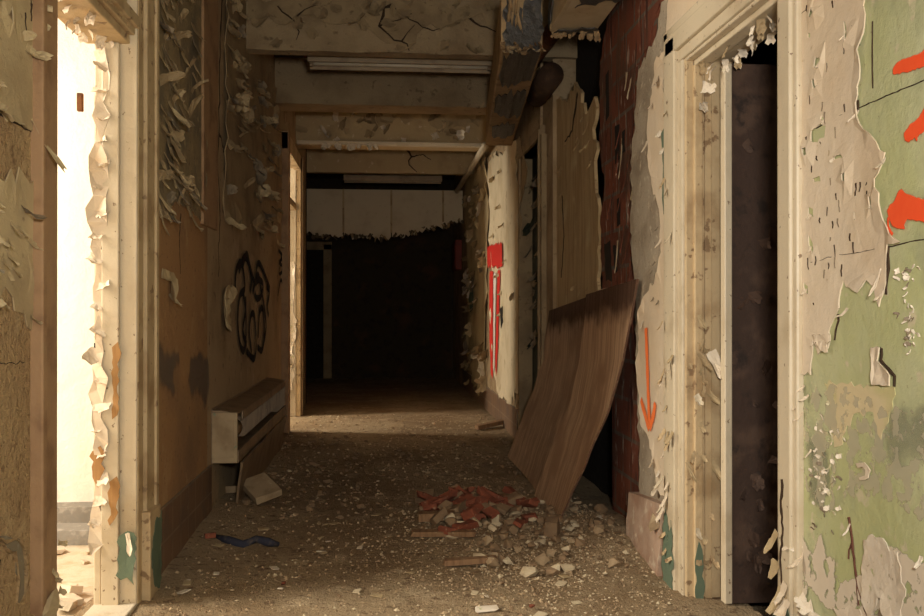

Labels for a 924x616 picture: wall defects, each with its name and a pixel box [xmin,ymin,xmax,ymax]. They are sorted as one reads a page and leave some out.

peeling [0,0,54,133]
peeling [159,0,209,236]
crack [277,5,317,40]
crack [378,4,440,51]
crack [815,21,924,129]
peeling [0,167,47,331]
peeling [45,0,121,556]
peeling [792,0,924,521]
peeling [52,568,67,608]
peeling [116,531,137,585]
peeling [151,511,162,588]
peeling [746,523,924,616]